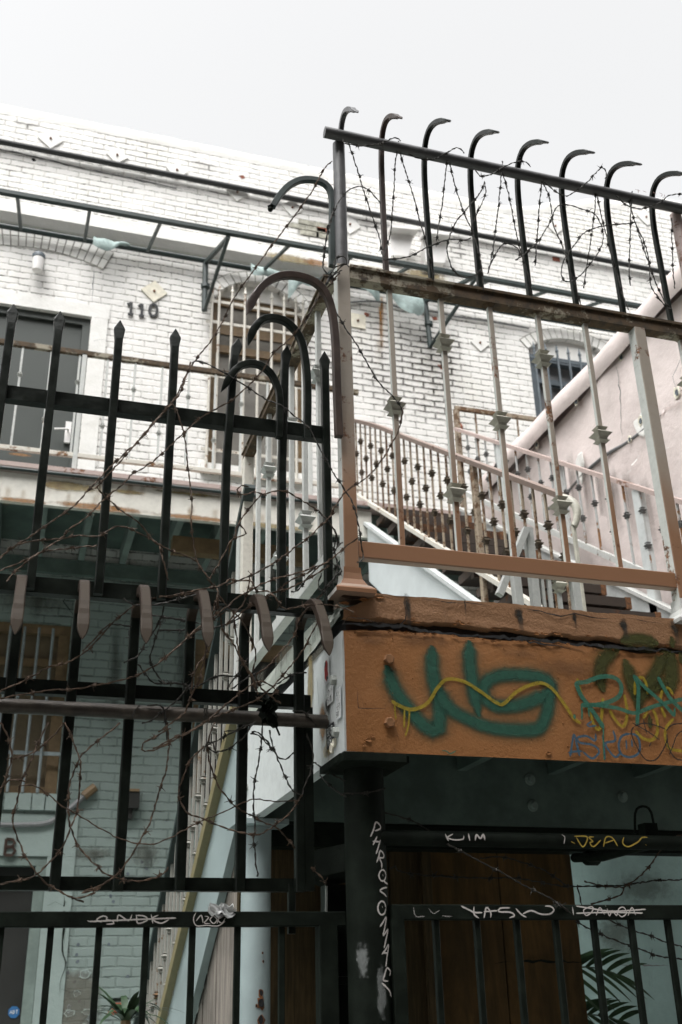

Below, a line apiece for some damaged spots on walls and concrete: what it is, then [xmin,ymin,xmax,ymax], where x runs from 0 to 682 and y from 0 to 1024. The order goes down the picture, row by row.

crack [344,596,682,655]